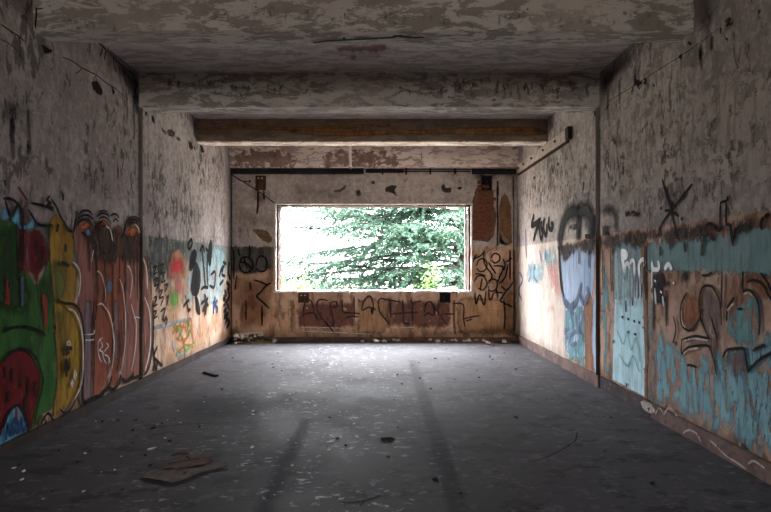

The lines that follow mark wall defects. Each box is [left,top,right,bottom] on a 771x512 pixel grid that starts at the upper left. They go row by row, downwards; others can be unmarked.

crack [313,35,424,43]
leakage [8,105,17,159]
peeling [233,148,298,169]
peeling [321,149,399,169]
flaking render [472,180,512,247]